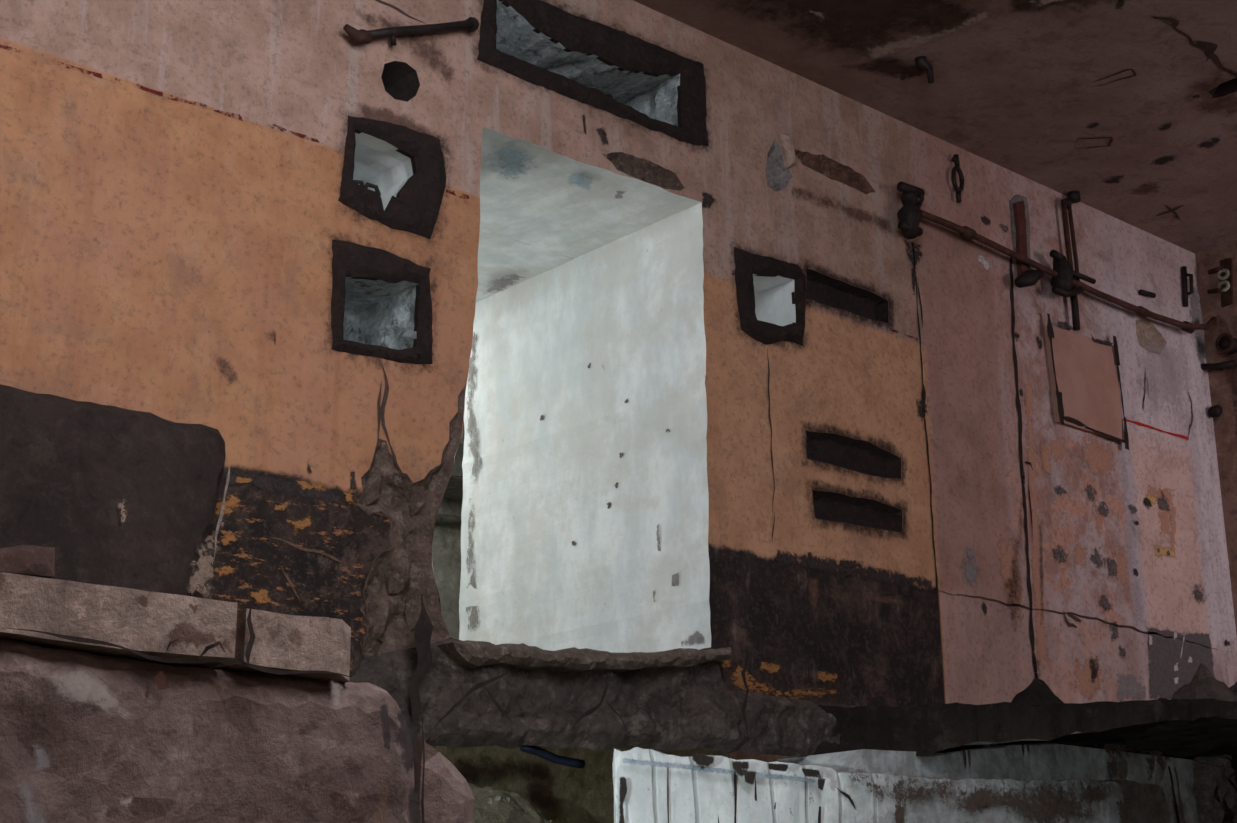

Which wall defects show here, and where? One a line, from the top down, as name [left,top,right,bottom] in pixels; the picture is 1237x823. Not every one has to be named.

leakage [738,0,977,77]
crack [1152,17,1237,77]
peeling [215,477,252,520]
peeling [274,503,311,531]
spalling [344,333,482,674]
peeling [214,565,235,577]
peeling [249,588,272,604]
leakage [775,550,933,596]
spalling [1192,584,1205,603]
peeling [722,659,840,700]
spalling [1192,754,1237,823]
leakage [894,803,906,823]